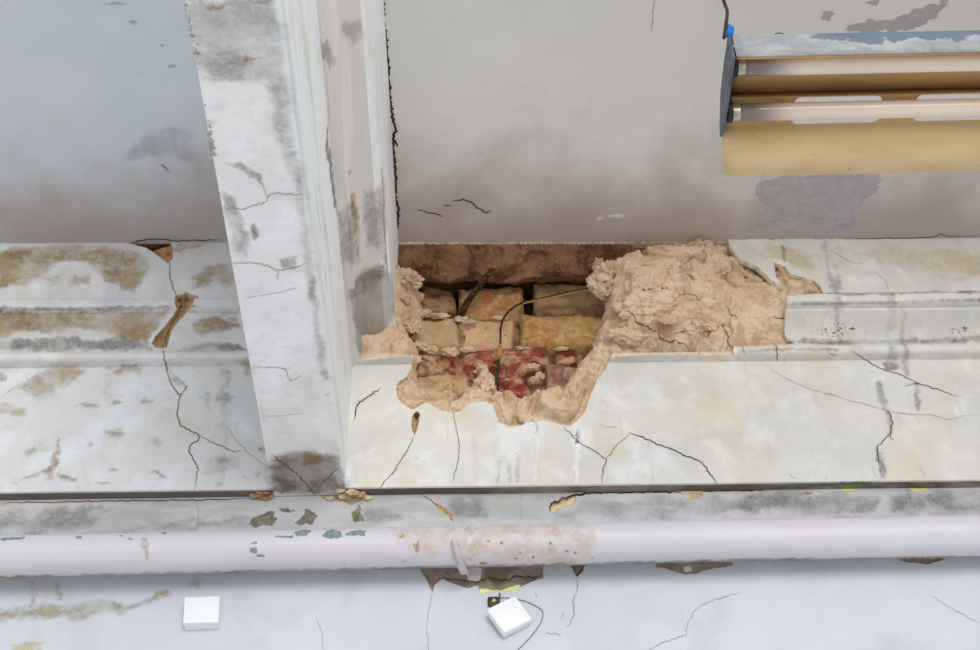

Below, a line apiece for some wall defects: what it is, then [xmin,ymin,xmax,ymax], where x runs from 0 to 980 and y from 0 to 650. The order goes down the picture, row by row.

crack [381,2,490,281]
leakage [0,250,144,289]
leakage [0,309,163,350]
spalling [151,292,199,348]
spalling [357,238,824,435]
crack [741,344,972,465]
crack [9,347,339,527]
leakage [272,456,346,494]
crack [549,429,763,511]
peeling [274,530,311,538]
peeling [323,529,366,539]
spalling [420,566,544,594]